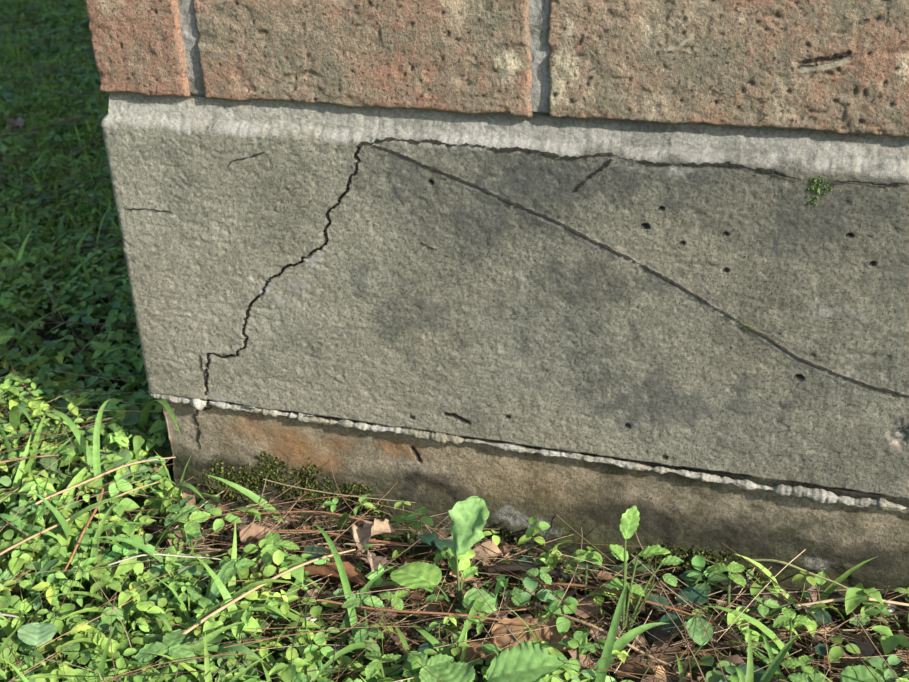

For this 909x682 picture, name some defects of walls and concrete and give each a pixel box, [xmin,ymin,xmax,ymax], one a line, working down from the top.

crack [193,137,909,449]